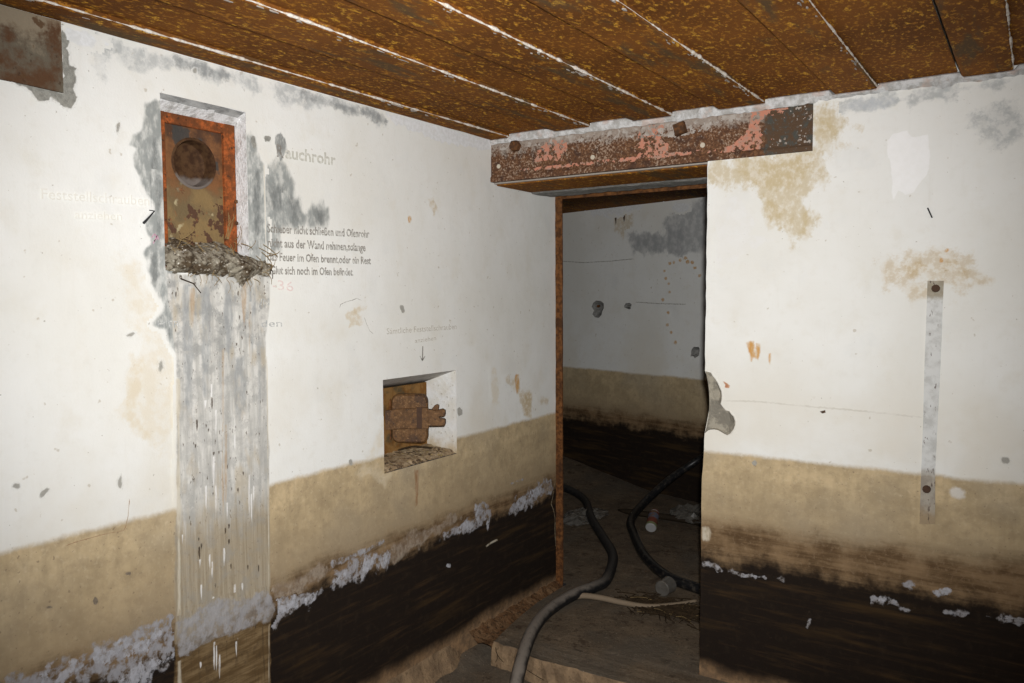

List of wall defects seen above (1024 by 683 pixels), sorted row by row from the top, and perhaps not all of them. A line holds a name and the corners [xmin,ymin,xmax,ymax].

damp [586,0,1024,265]
damp [0,94,556,683]
flaking render [705,371,737,435]
rust [744,339,773,366]
damp [563,361,1024,683]